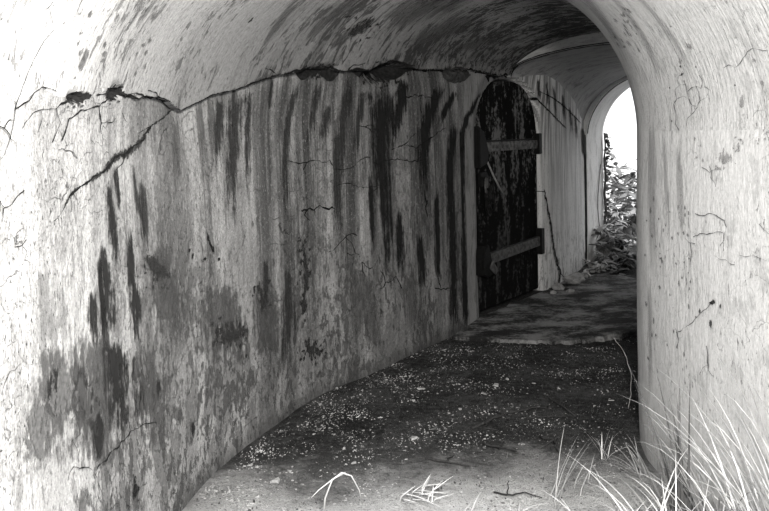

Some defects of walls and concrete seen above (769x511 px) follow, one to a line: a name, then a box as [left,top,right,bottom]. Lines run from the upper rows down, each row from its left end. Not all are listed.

spalling [65,84,137,108]
crack [0,1,388,221]
damp [197,90,252,217]
spalling [296,63,340,81]
damp [306,80,425,324]
spalling [352,59,415,89]
damp [434,92,483,323]
crack [466,42,611,82]
crack [689,213,766,265]
damp [28,166,184,466]
damp [200,261,298,364]
crack [68,422,157,496]